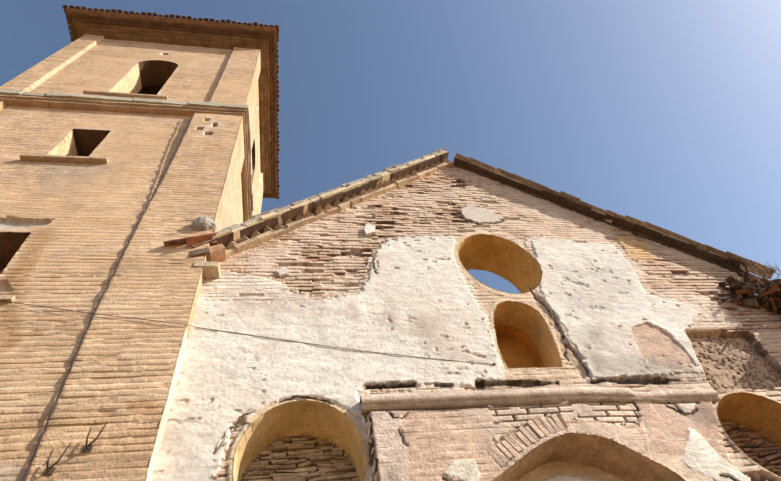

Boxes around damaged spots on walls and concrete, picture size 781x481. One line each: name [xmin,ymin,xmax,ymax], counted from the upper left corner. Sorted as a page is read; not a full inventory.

spalling [226,166,781,402]
crack [528,286,589,377]
spalling [486,400,640,431]
spalling [212,421,251,481]
spalling [732,451,781,481]